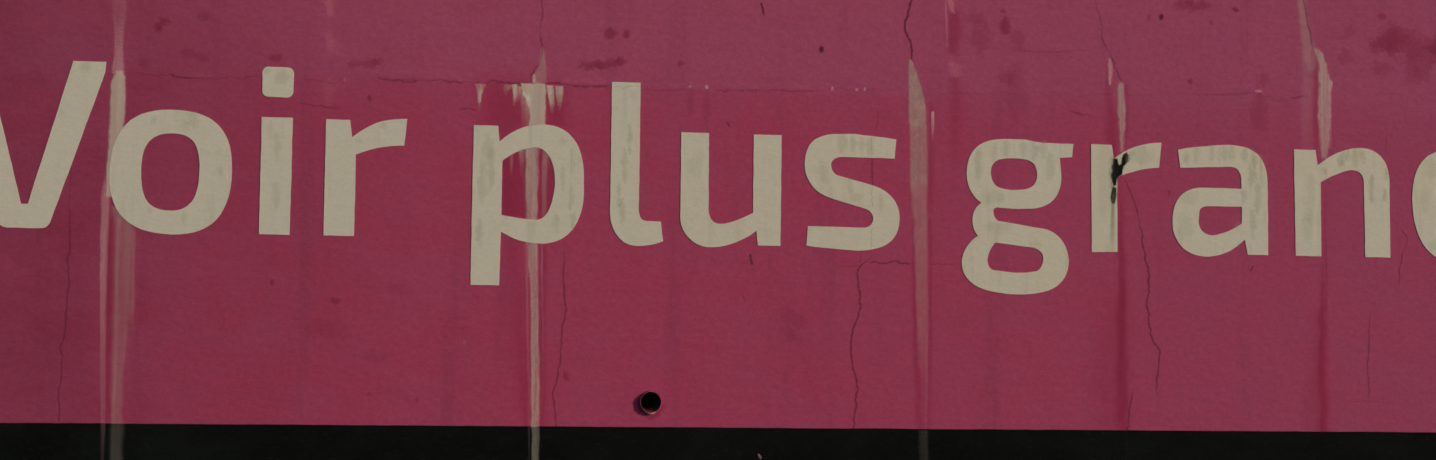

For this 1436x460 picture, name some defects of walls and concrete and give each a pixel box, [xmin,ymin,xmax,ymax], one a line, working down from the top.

crack [904,0,913,59]
efflorescence [514,84,552,126]
crack [851,266,861,428]